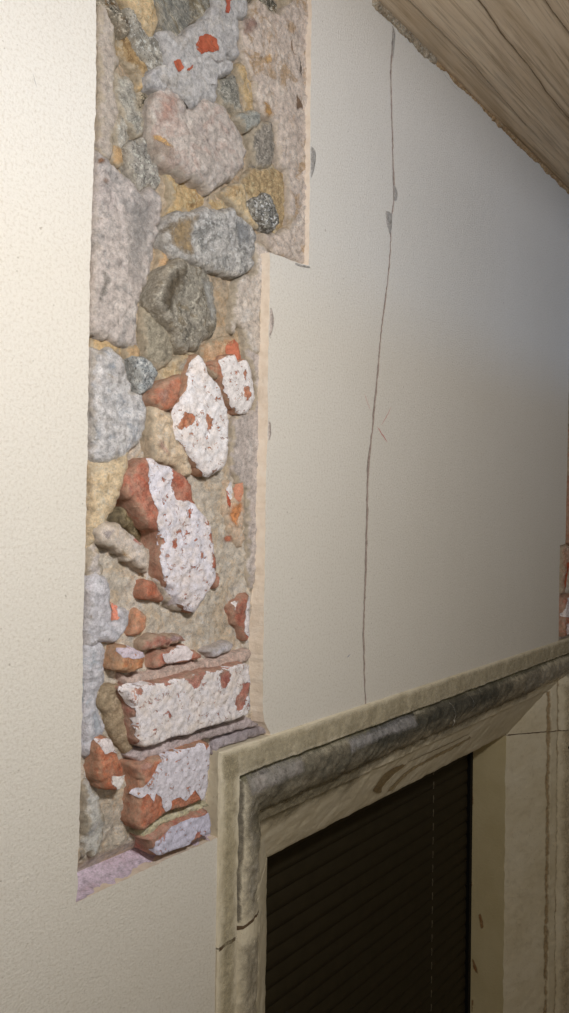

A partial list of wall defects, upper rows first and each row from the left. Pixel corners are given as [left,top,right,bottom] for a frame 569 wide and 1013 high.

flaking render [76,0,316,902]
crack [362,25,397,704]
flaking render [559,399,569,639]
crack [219,910,259,952]